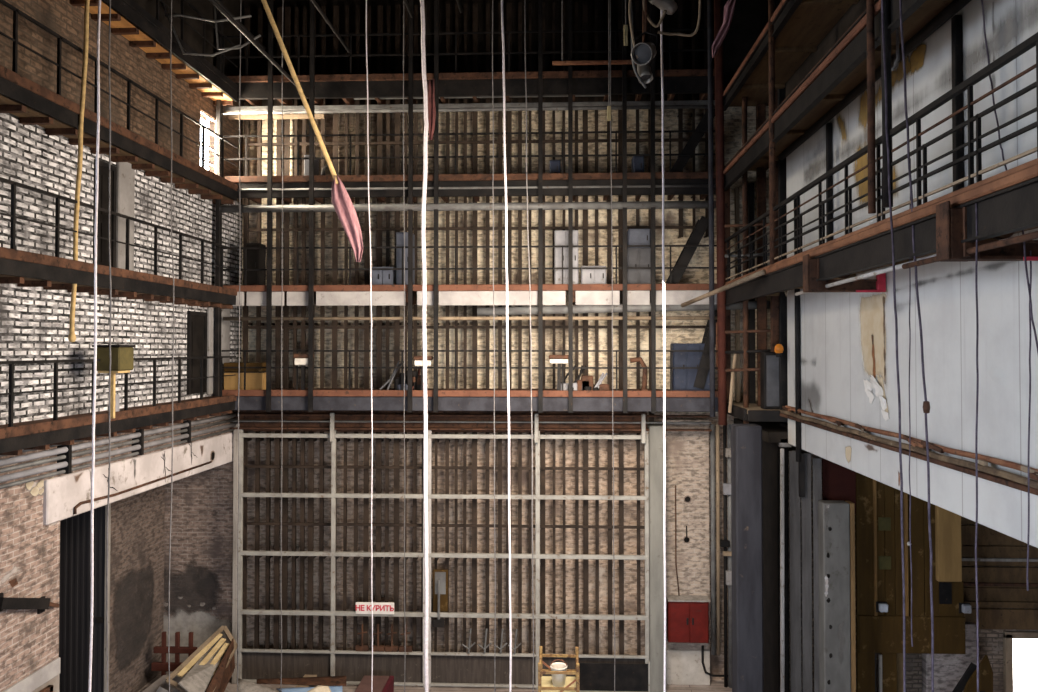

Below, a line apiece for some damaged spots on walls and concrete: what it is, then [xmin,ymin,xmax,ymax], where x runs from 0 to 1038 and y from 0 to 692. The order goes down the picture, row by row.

damp [944,8,1036,85]
peeling [863,375,889,421]
damp [114,564,154,671]